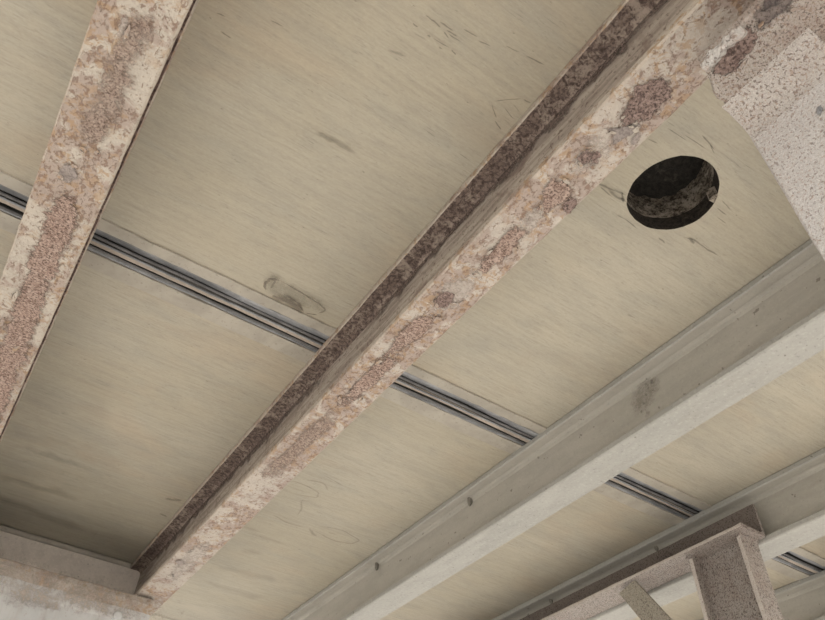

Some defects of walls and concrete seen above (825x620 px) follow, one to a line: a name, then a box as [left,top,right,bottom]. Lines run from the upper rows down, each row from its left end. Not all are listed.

rust [79,14,153,155]
rust [381,0,673,312]
rust [713,0,797,76]
rust [0,192,79,419]
rust [157,381,318,557]
rust [262,291,455,477]